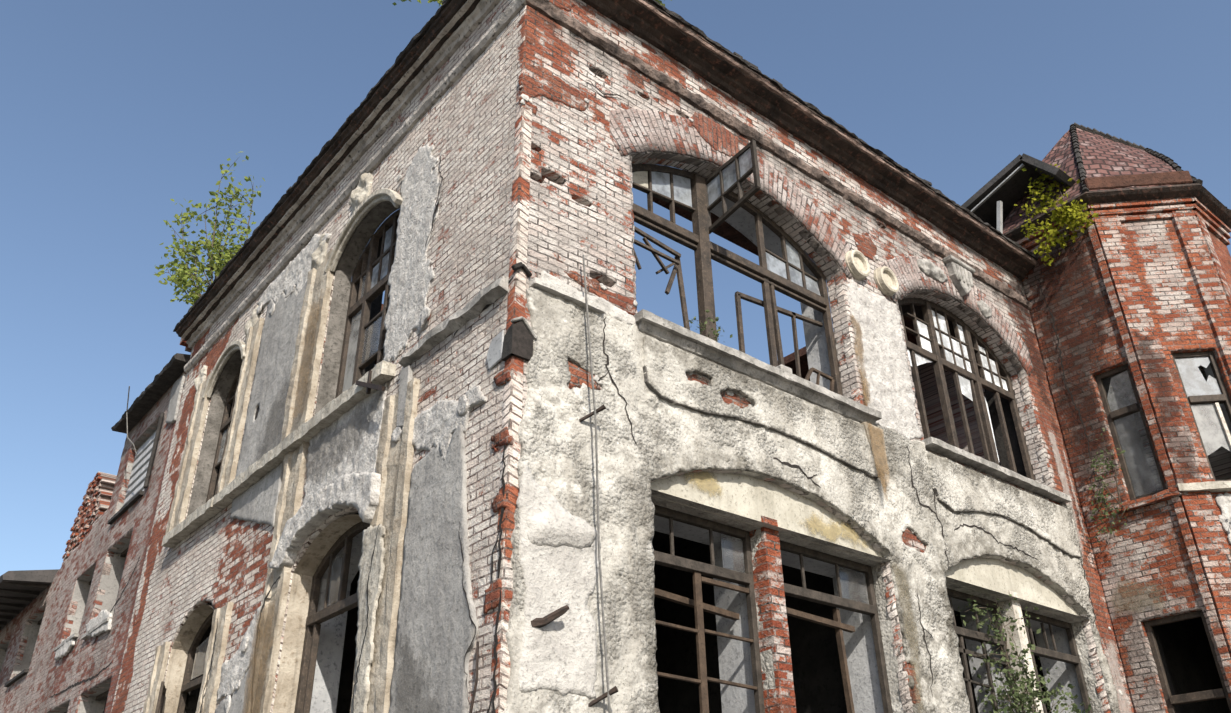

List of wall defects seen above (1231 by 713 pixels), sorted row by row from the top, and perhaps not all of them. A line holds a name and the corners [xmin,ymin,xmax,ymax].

spalling [518,63,589,115]
spalling [530,168,565,186]
spalling [564,270,638,315]
spalling [568,361,603,390]
crack [597,317,637,445]
spalling [686,372,753,408]
crack [773,457,821,488]
crack [907,446,1038,568]
flaking render [269,368,514,713]
spalling [902,528,926,553]